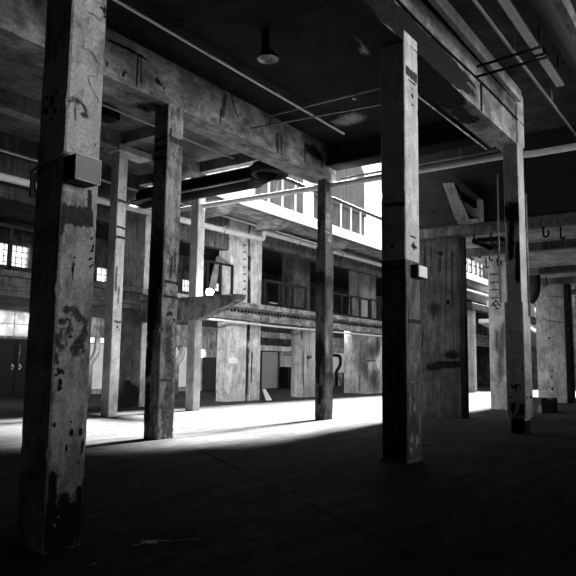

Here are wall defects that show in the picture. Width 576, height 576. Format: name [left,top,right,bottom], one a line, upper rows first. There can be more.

water stain [61,190,93,235]
water stain [504,202,520,284]
water stain [426,350,460,370]
water stain [44,471,83,553]